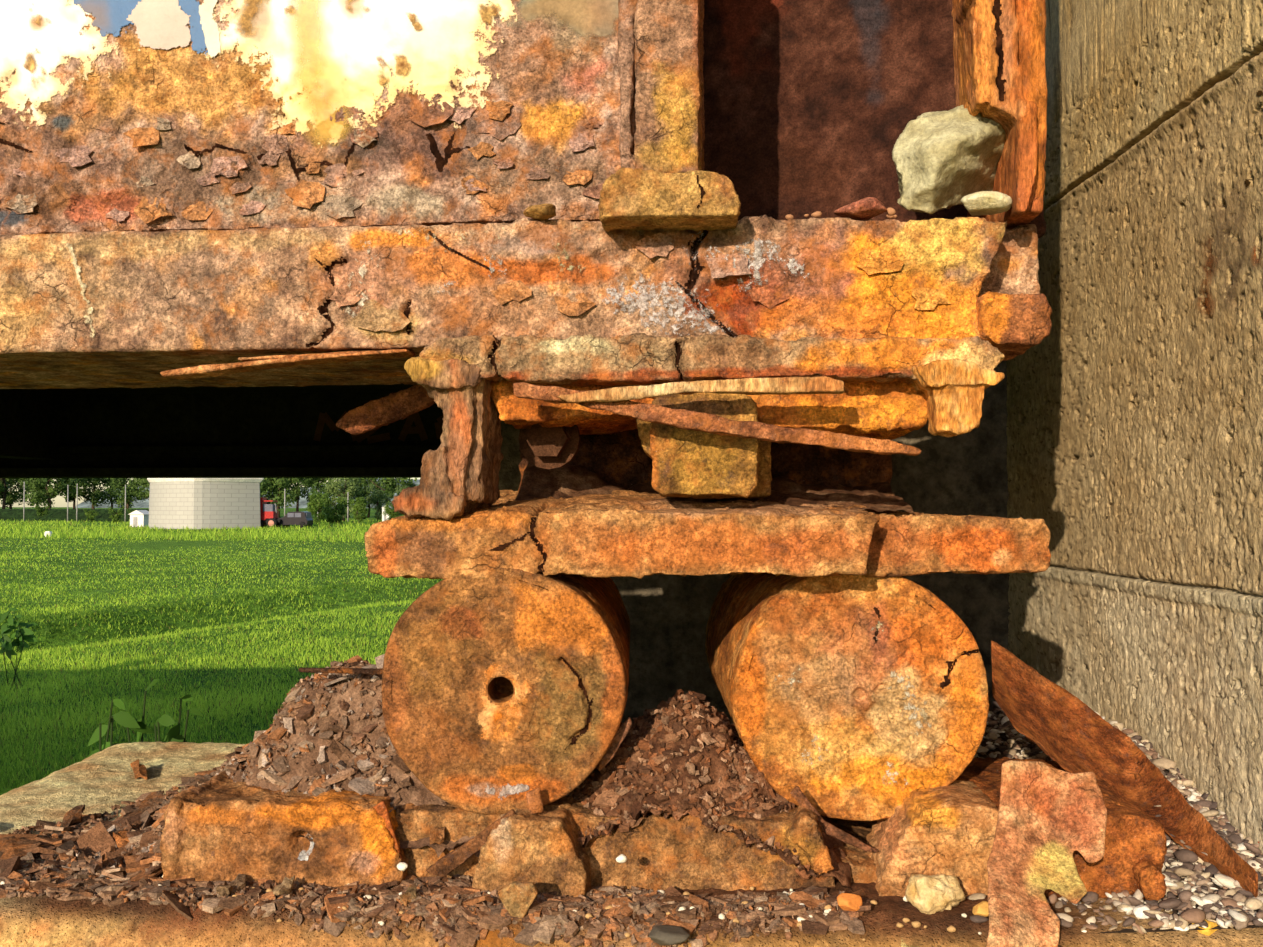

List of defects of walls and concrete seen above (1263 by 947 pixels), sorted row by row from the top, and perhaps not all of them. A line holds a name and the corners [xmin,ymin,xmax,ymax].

rust [23,49,44,83]
peeling [0,0,619,219]
rust [284,0,342,136]
rust [377,55,410,85]
peeling [105,176,213,224]
crack [306,256,347,347]
crack [675,175,738,338]
crack [674,341,682,376]